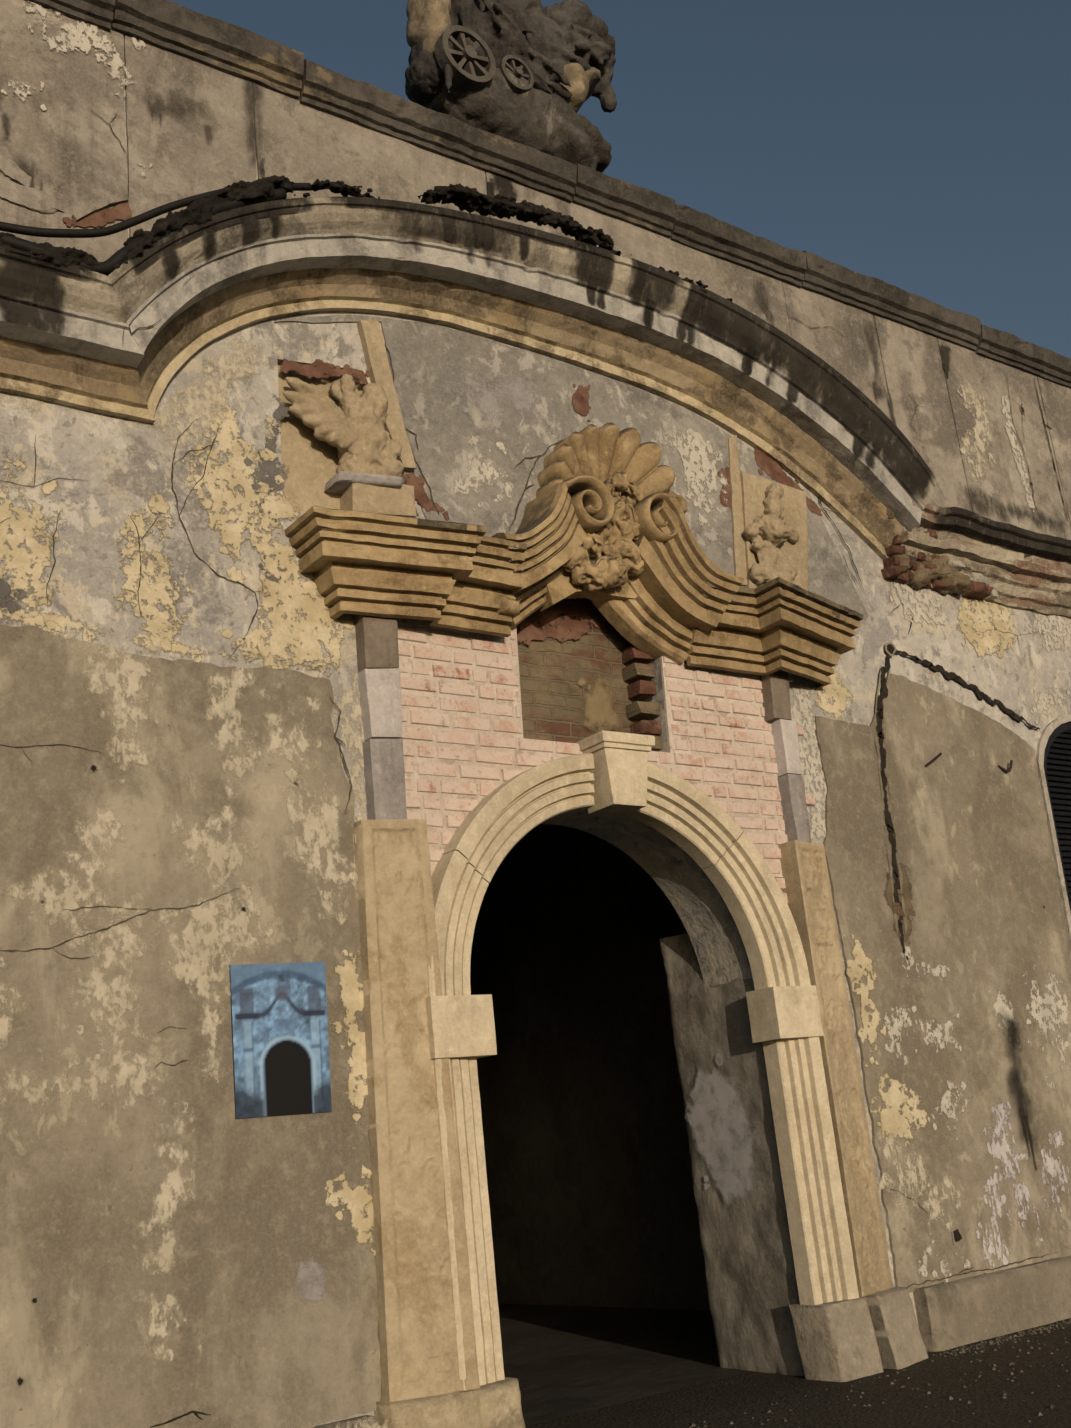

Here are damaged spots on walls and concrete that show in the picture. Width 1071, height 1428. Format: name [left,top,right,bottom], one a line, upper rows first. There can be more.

peeling [22,0,135,97]
leakage [0,245,93,335]
leakage [331,196,934,502]
crack [130,421,263,660]
spalling [858,508,1071,668]
crack [0,744,101,760]
peeling [0,340,370,1124]
crack [874,603,1040,954]
crack [0,888,240,959]
peeling [846,933,1071,1282]
leakage [1007,1019,1037,1170]
peeling [325,1165,376,1256]